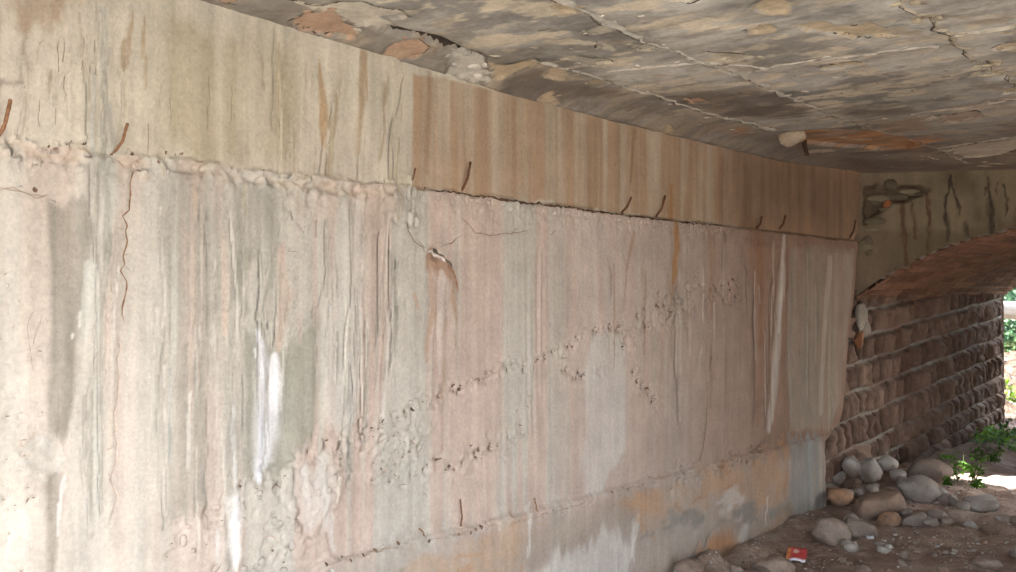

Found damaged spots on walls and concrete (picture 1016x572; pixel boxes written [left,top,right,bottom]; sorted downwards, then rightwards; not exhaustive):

crack [93,84,172,521]
damp [0,0,458,572]
peeling [281,0,618,106]
crack [407,205,556,252]
rust [411,69,952,299]
damp [542,147,1016,541]
peeling [778,131,837,156]
peeling [743,0,948,50]
peeling [929,18,1016,167]
damp [524,498,707,572]